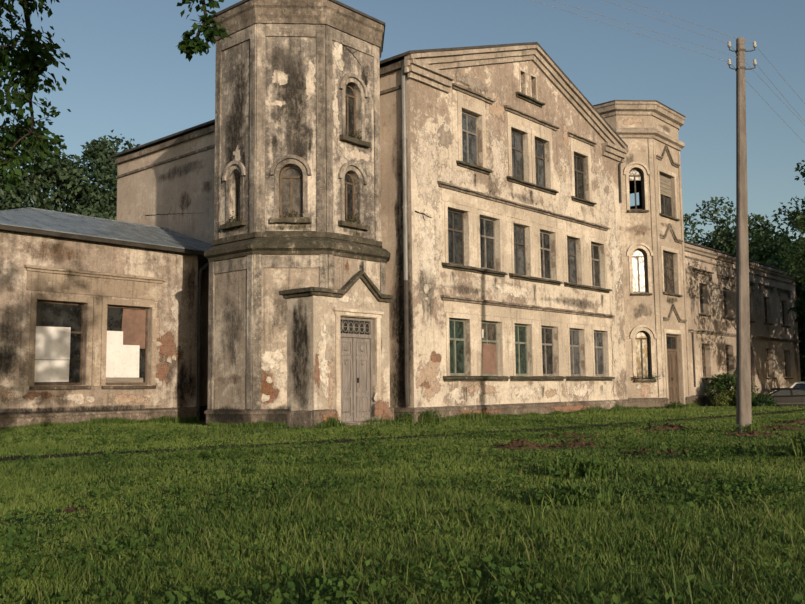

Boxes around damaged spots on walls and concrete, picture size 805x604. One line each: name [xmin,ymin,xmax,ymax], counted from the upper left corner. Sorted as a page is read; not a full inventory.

flaking render [272,69,288,85]
water stain [272,46,312,166]
water stain [391,158,412,403]
water stain [165,360,194,407]
flaking render [261,347,287,390]
water stain [272,298,309,406]
flaking render [413,360,464,404]
flaking render [567,384,592,398]
water stain [267,408,291,426]